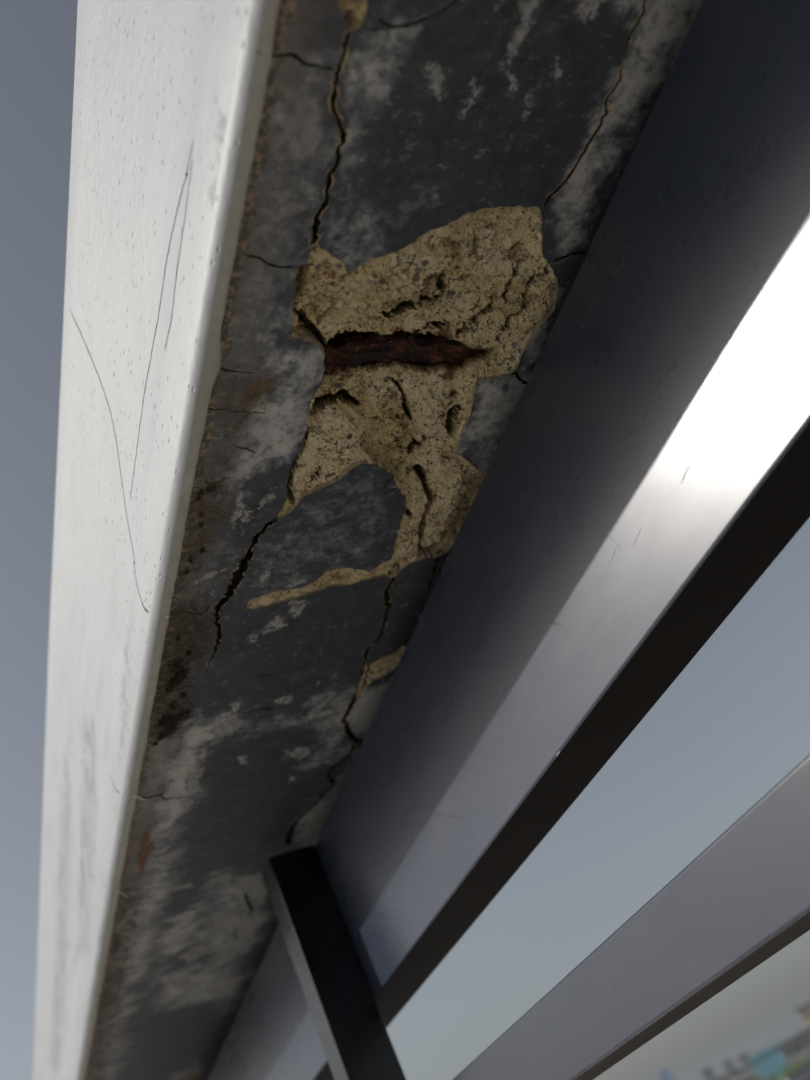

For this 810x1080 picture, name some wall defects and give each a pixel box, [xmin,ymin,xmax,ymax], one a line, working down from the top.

crack [242,0,458,269]
spalling [337,0,368,35]
crack [544,0,649,208]
crack [69,141,279,672]
spalling [230,206,558,643]
crack [284,563,400,847]